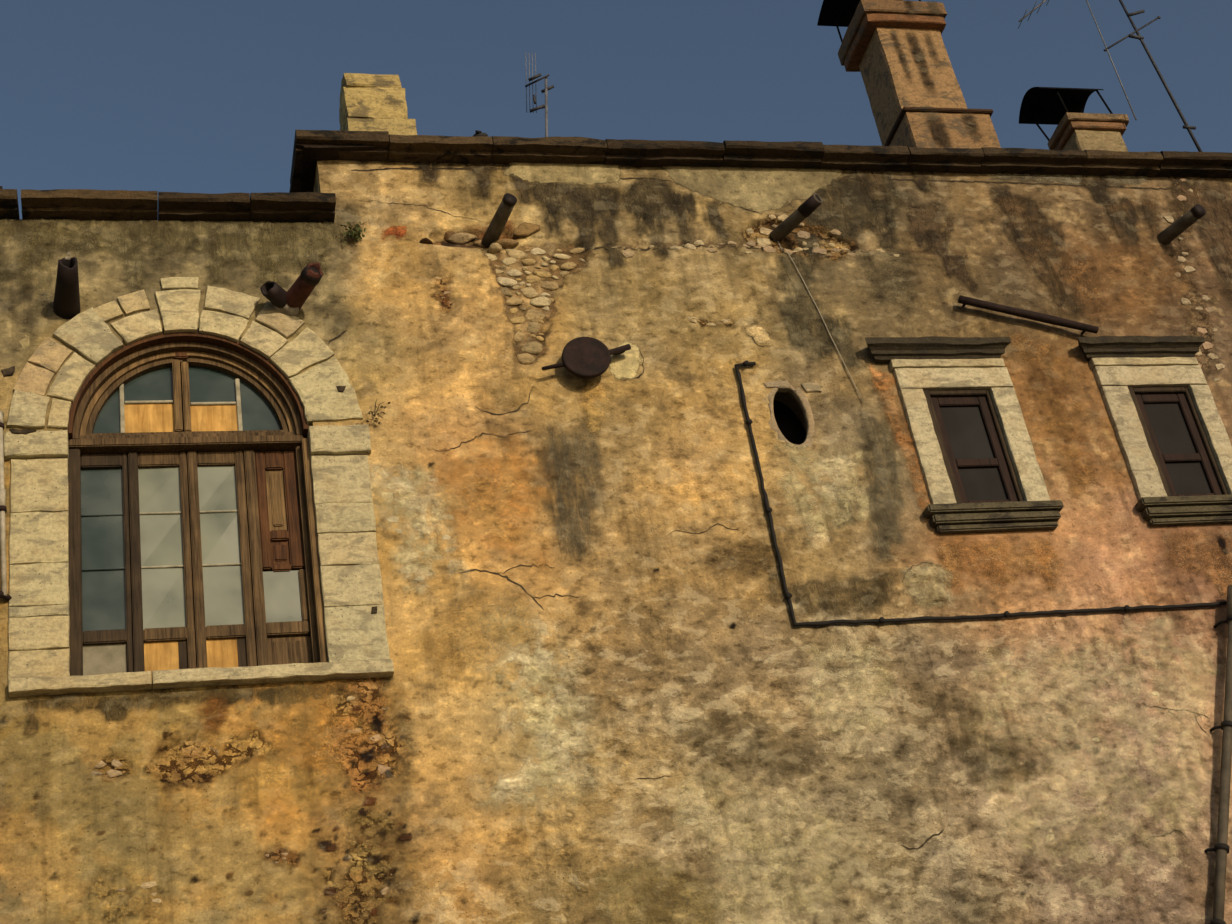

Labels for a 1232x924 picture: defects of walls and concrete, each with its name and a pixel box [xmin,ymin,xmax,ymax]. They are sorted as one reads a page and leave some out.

water stain [360,160,727,266]
spalling [592,214,910,260]
crack [433,429,534,451]
water stain [537,427,600,551]
crack [460,564,580,610]
spalling [91,722,270,789]
spalling [263,677,412,924]